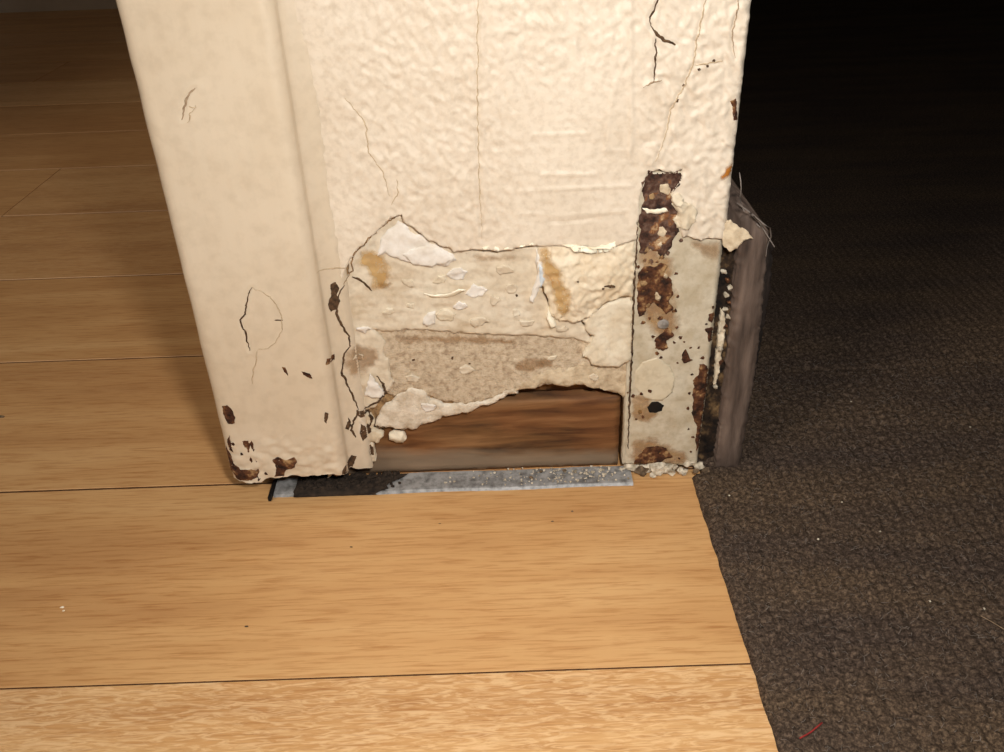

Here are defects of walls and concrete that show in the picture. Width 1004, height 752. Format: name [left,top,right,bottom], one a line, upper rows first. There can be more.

crack [643,0,739,160]
spalling [222,405,297,481]
crack [239,287,283,383]
flaking render [342,455,356,474]
crack [317,98,399,438]
flaking render [328,215,675,462]
rust [634,169,715,464]
flaking render [697,220,753,460]